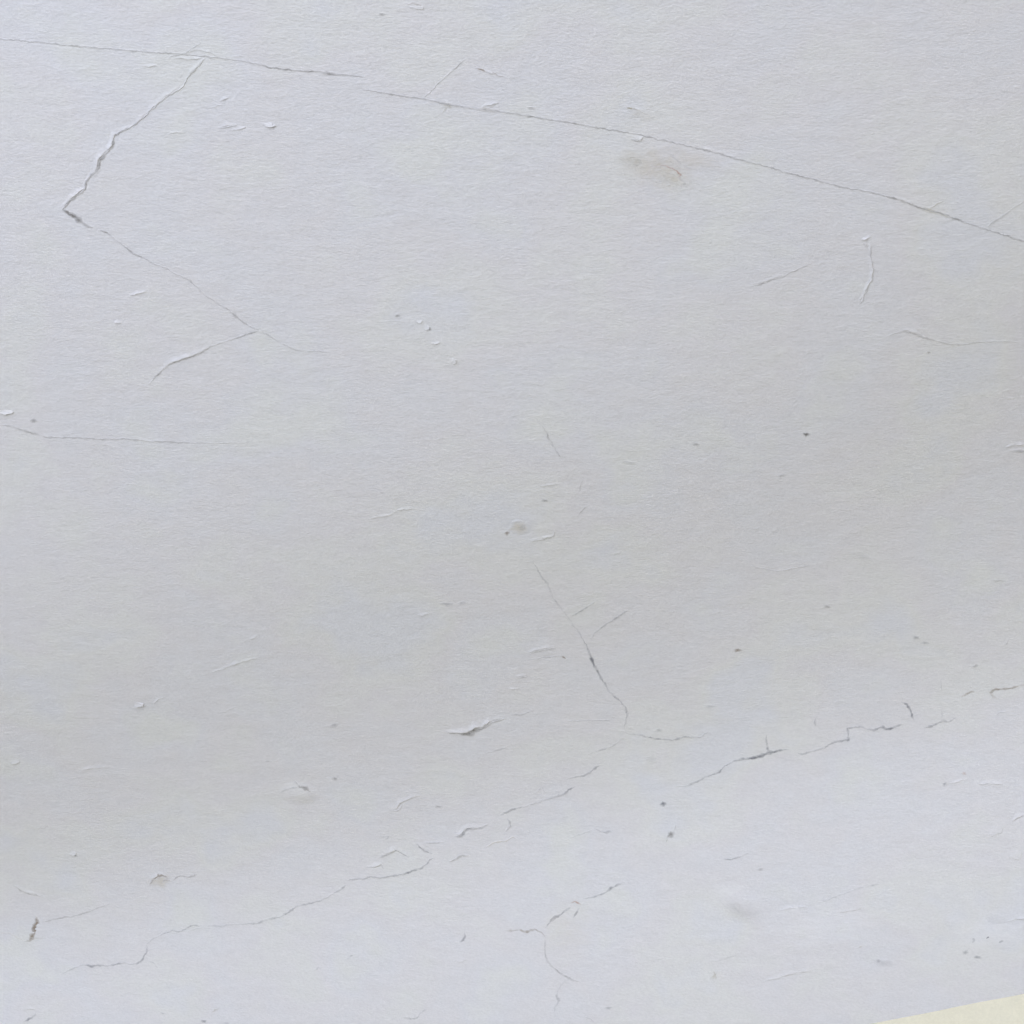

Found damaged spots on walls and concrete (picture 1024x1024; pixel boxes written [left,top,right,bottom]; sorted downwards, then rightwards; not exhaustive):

crack [0,38,1024,384]
peeling [442,710,534,737]
crack [500,561,709,815]
crack [675,683,1024,787]
crack [60,884,346,975]